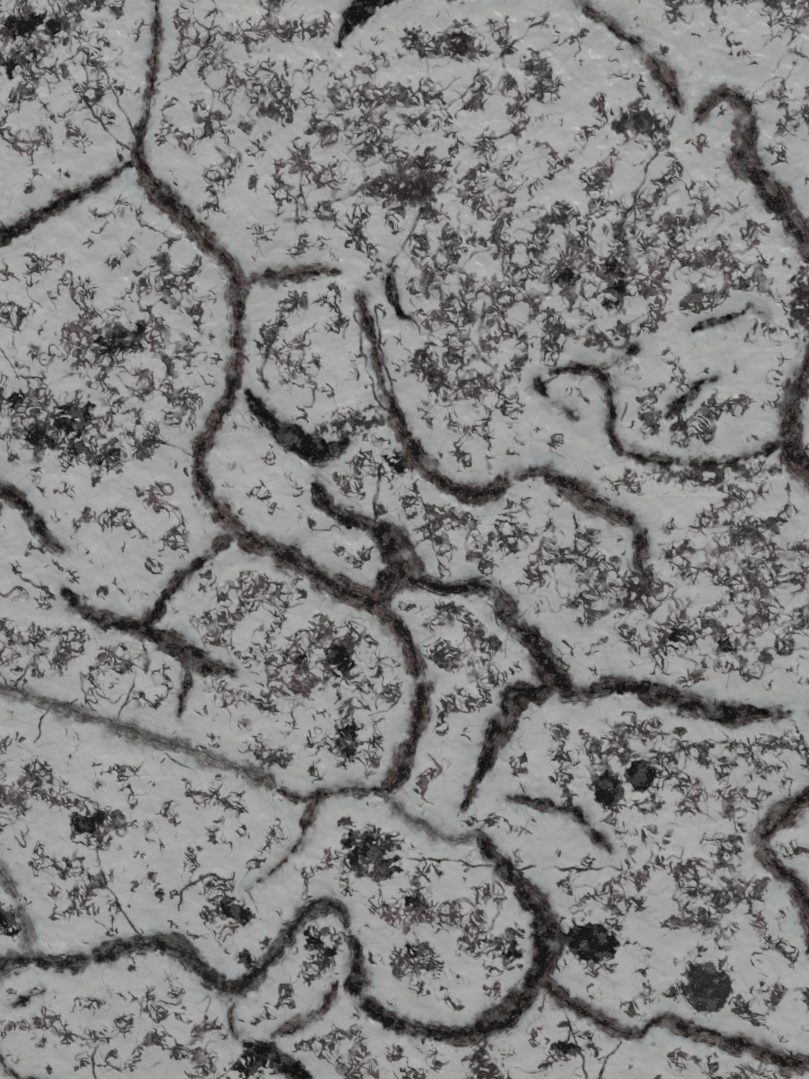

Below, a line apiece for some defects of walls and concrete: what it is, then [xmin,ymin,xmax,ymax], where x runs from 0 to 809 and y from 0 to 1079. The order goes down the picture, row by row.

damp [0,10,67,80]
damp [611,110,669,139]
damp [785,266,809,344]
damp [24,400,127,473]
crack [0,0,809,835]
damp [594,756,657,810]
damp [70,810,105,834]
damp [340,829,404,879]
crack [0,786,809,1079]
damp [564,922,620,963]
damp [681,961,733,1012]
damp [229,1039,276,1079]